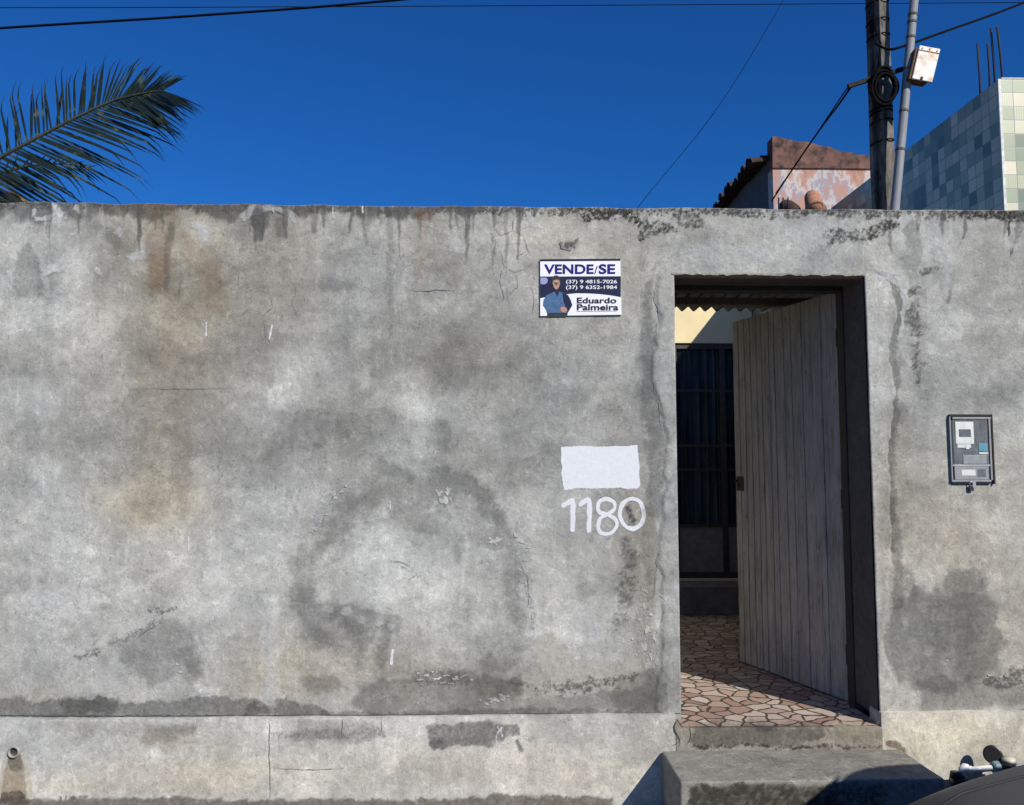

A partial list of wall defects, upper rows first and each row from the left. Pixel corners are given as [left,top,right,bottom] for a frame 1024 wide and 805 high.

water stain [0,202,911,248]
water stain [926,210,1024,222]
water stain [430,722,521,750]